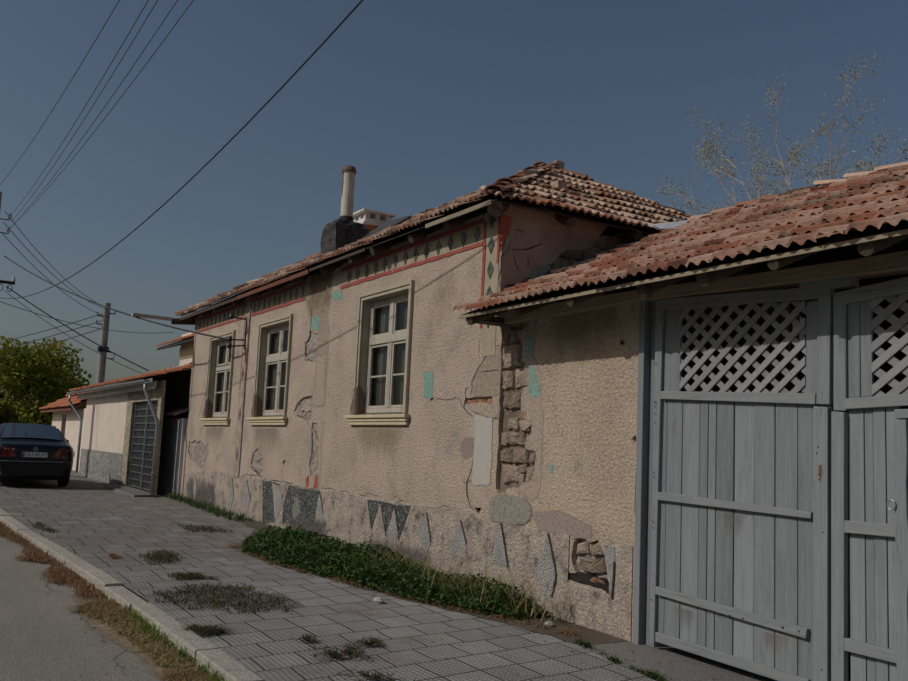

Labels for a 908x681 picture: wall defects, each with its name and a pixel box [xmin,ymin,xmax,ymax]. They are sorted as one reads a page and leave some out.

crack [499,229,542,286]
flaking render [295,272,342,490]
flaking render [467,345,501,420]
flaking render [518,321,553,501]
spalling [568,539,609,594]